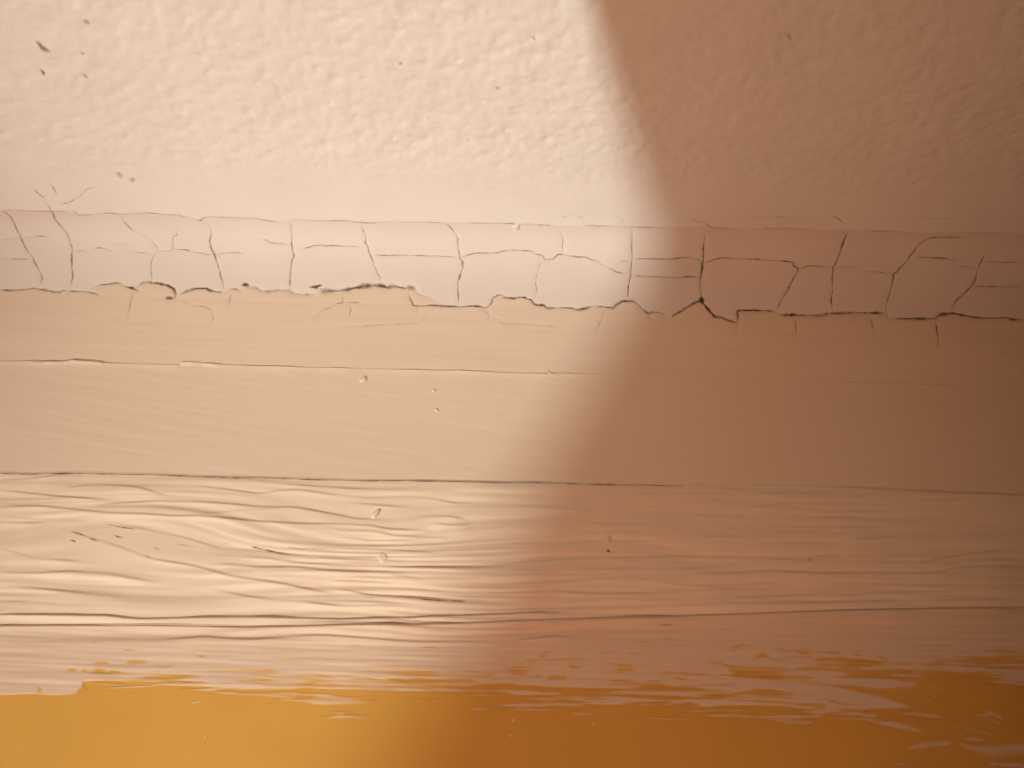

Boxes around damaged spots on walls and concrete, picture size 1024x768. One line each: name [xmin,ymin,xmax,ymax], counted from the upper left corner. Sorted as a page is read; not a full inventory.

crack [5,195,223,294]
crack [346,222,1017,336]